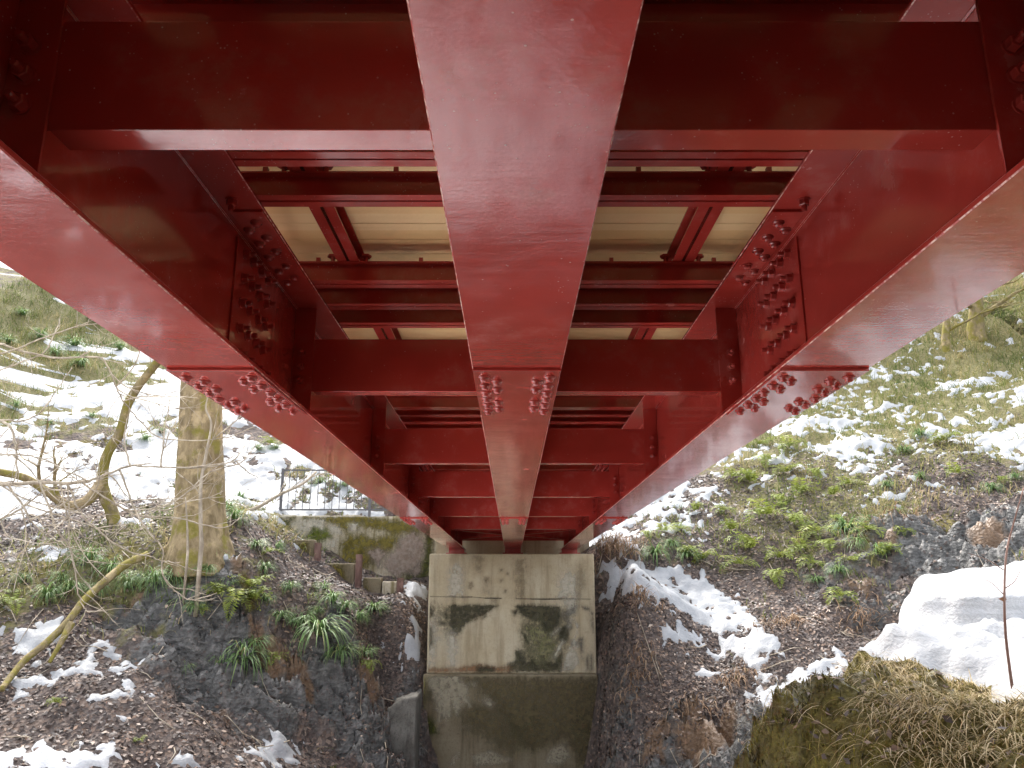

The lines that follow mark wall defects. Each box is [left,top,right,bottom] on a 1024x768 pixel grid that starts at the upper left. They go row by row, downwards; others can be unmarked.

leakage [426,560,597,766]